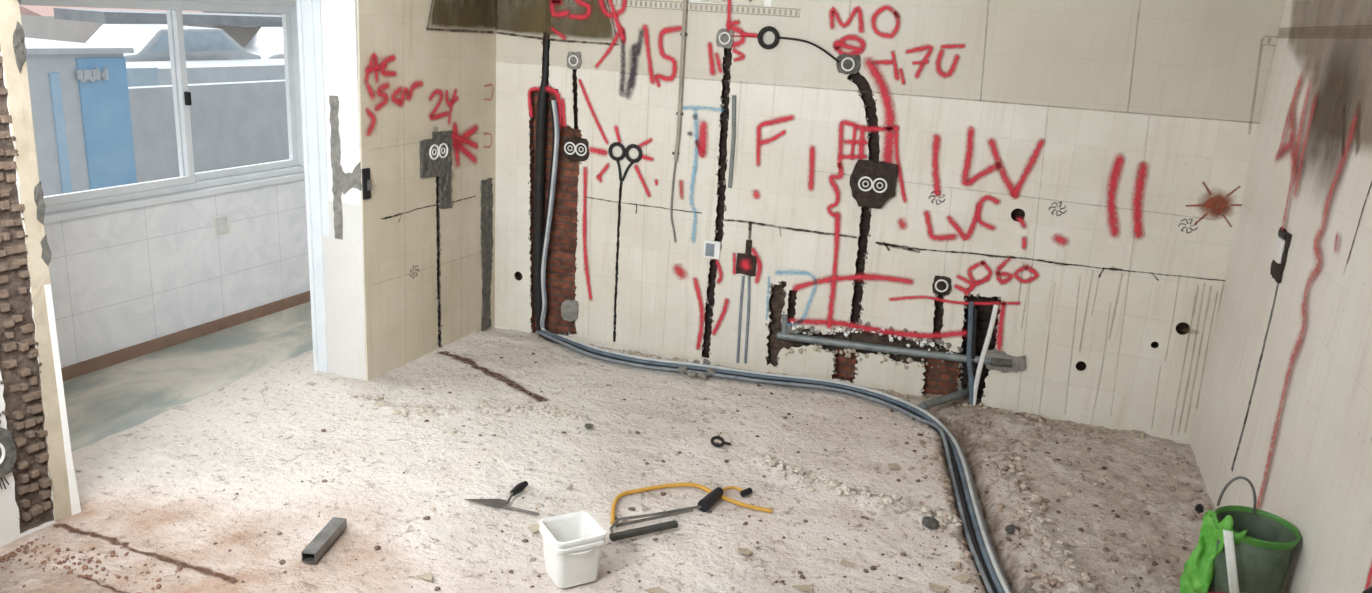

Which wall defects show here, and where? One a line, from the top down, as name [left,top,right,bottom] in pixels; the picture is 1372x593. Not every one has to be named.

spalling [13,0,27,73]
damp [1290,0,1372,171]
spalling [34,181,51,266]